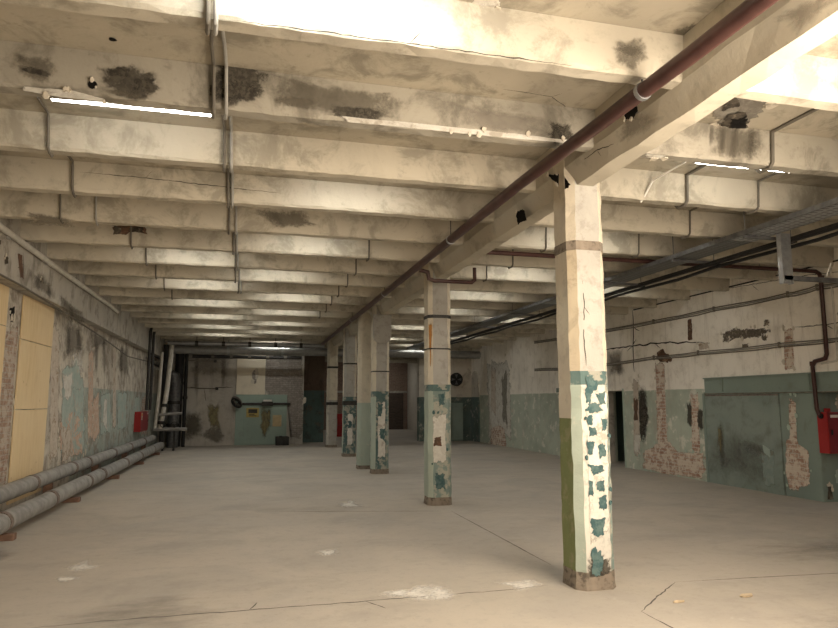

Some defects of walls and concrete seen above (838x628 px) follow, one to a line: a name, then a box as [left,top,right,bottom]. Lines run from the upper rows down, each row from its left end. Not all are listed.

water stain [103,66,157,100]
mould [210,65,267,107]
water stain [616,40,645,68]
water stain [714,127,760,157]
peeling [57,344,147,466]
peeling [376,402,387,463]
peeling [432,392,448,489]
peeling [585,376,612,577]
flaking render [632,349,707,482]
flaking render [783,393,812,491]